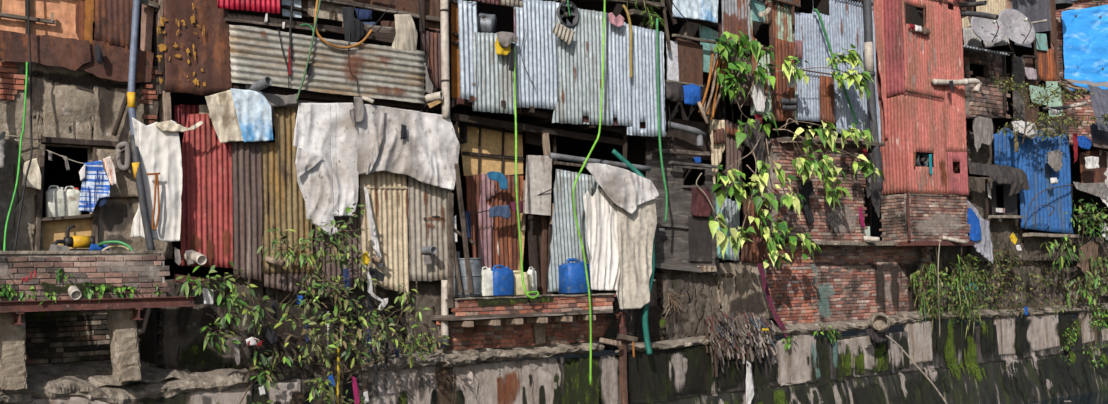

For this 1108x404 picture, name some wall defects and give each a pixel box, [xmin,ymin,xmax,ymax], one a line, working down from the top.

corrosion [344,44,365,80]
corrosion [939,160,947,191]
leakage [577,308,617,343]
leakage [599,306,1108,404]